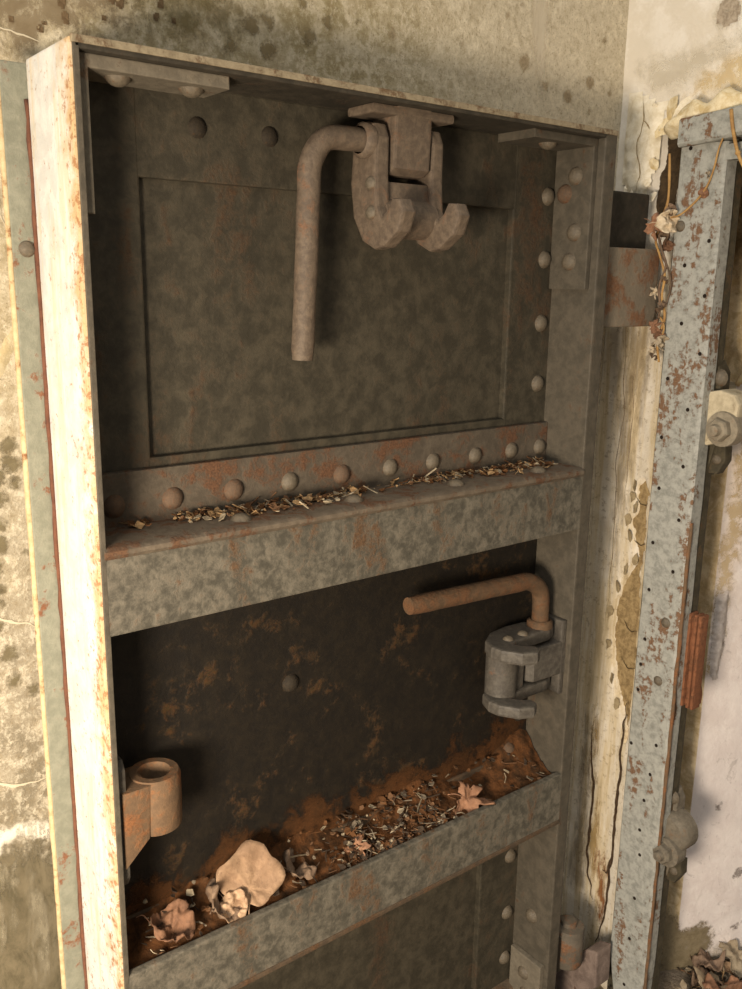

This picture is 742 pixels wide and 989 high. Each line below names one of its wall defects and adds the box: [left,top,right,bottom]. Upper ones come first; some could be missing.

leakage [0,0,120,49]
peeling [606,479,650,727]
rust [658,523,709,846]
crack [586,703,627,942]
rust [643,861,660,989]